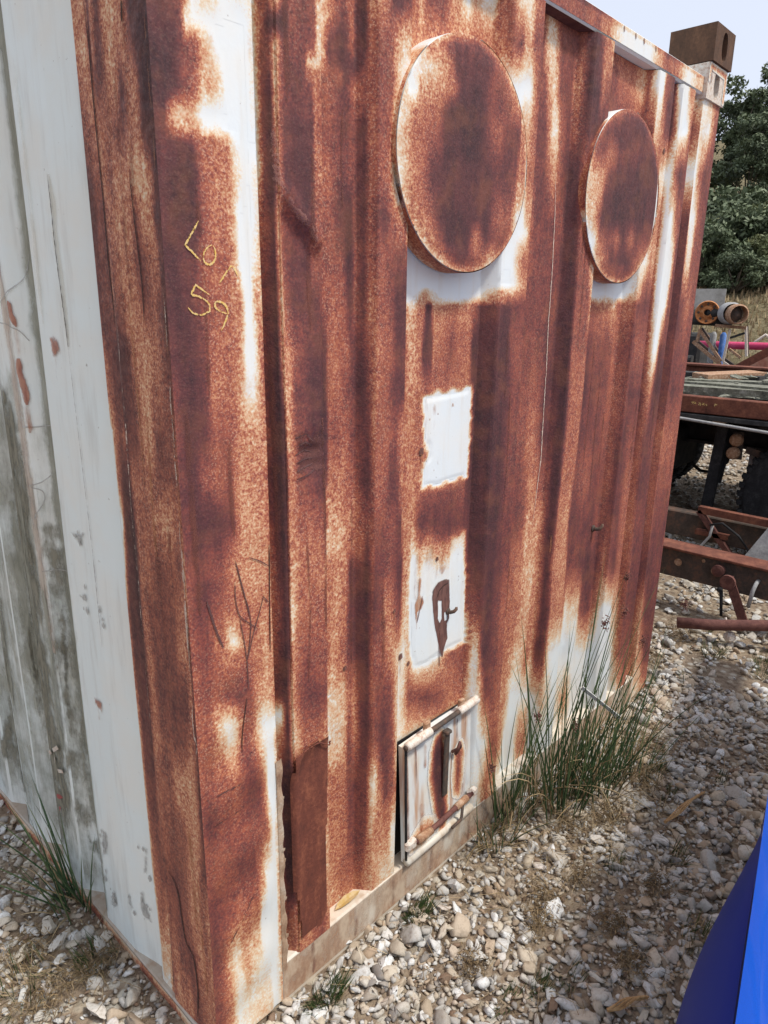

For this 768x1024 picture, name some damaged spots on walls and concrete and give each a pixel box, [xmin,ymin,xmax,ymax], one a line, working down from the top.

corrosion [16,358,30,405]
water stain [1,390,94,840]
corrosion [70,0,371,1024]
corrosion [365,0,720,891]
corrosion [0,794,191,1024]
corrosion [373,866,416,923]